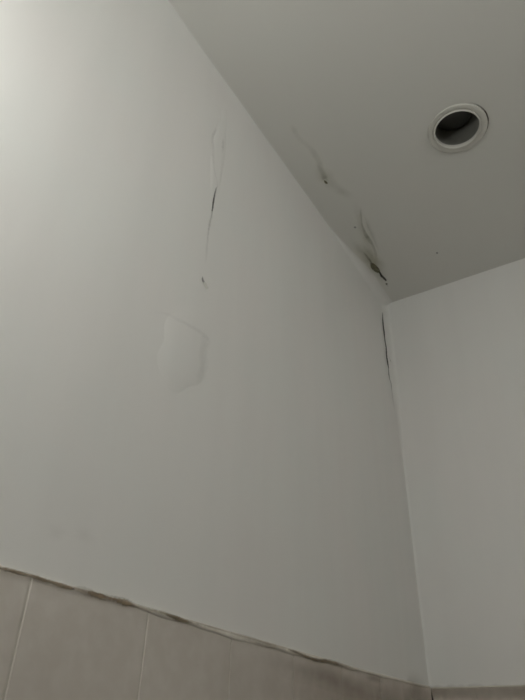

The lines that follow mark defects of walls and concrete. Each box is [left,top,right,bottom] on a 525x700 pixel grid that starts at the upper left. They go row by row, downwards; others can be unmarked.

crack [370,263,387,285]
crack [381,314,391,382]